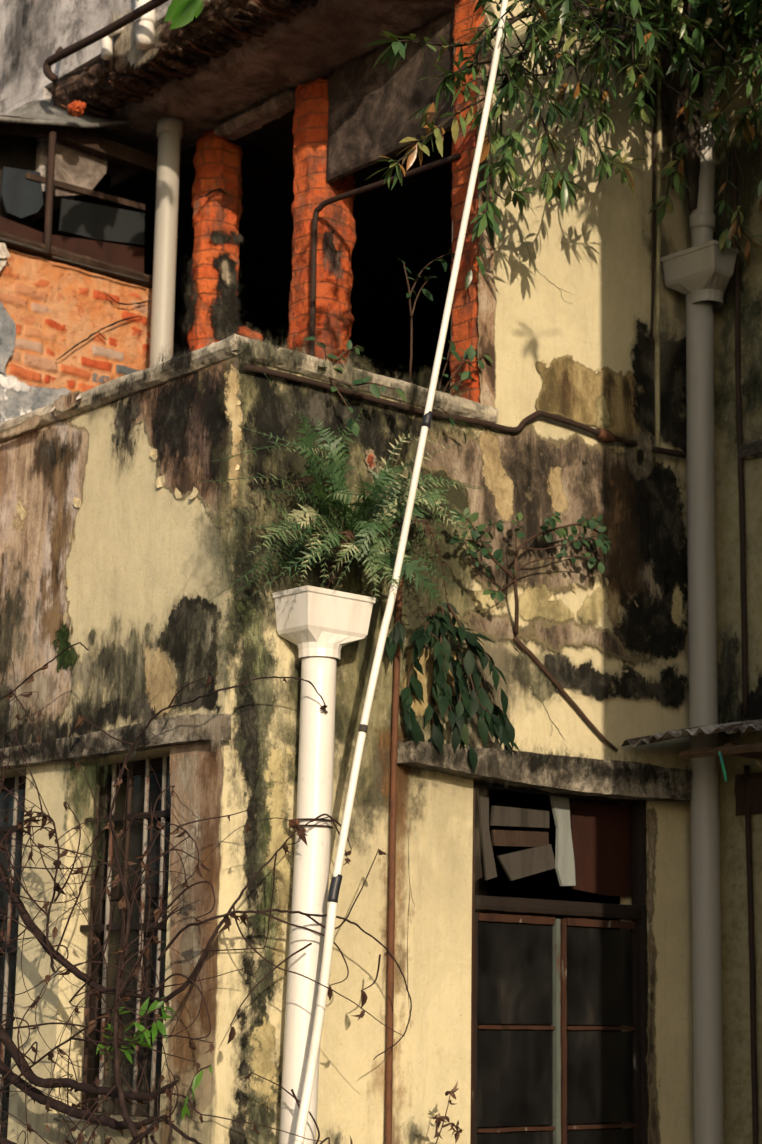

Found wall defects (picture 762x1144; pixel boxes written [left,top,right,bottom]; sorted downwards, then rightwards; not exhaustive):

leakage [3,0,34,76]
leakage [615,49,671,163]
leakage [0,230,447,1144]
peeling [421,354,660,670]
leakage [420,292,693,787]
leakage [717,626,762,738]
corrosion [169,740,224,1071]